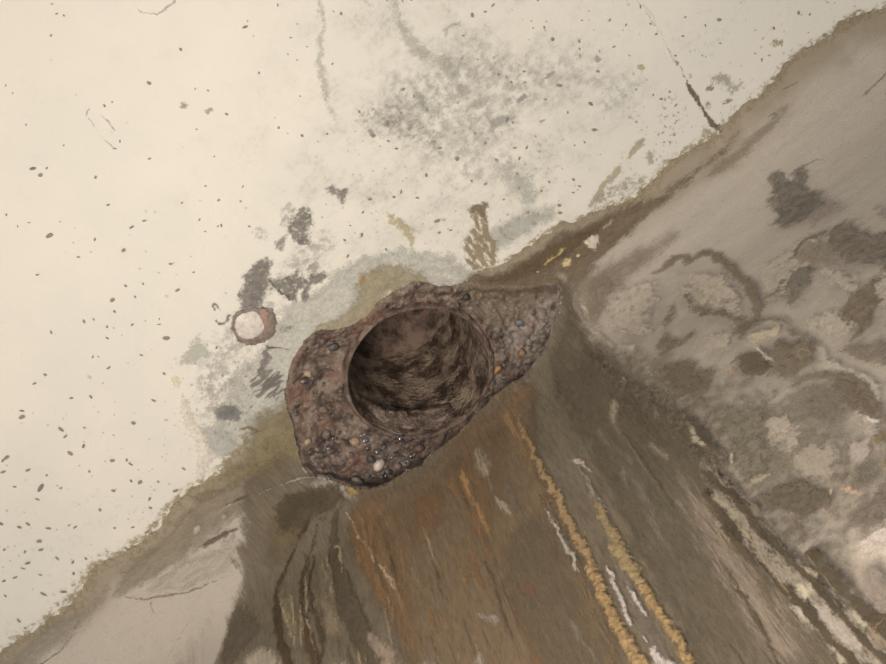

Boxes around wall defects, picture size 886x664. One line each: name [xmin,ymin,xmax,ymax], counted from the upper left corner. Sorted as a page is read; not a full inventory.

damp [484,112,515,133]
damp [629,139,661,164]
crack [676,62,722,132]
damp [708,108,785,176]
rust [315,264,427,332]
damp [115,167,886,664]
peeling [852,526,886,557]
peeling [860,567,886,622]